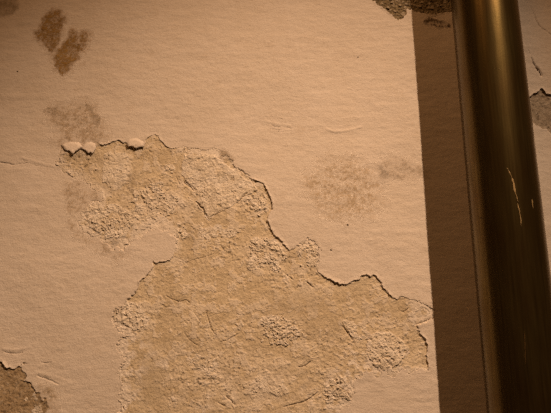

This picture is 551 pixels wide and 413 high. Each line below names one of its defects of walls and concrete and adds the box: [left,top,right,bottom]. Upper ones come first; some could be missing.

spalling [372,0,452,20]
spalling [529,86,551,133]
spalling [55,133,435,413]
spalling [0,357,48,413]